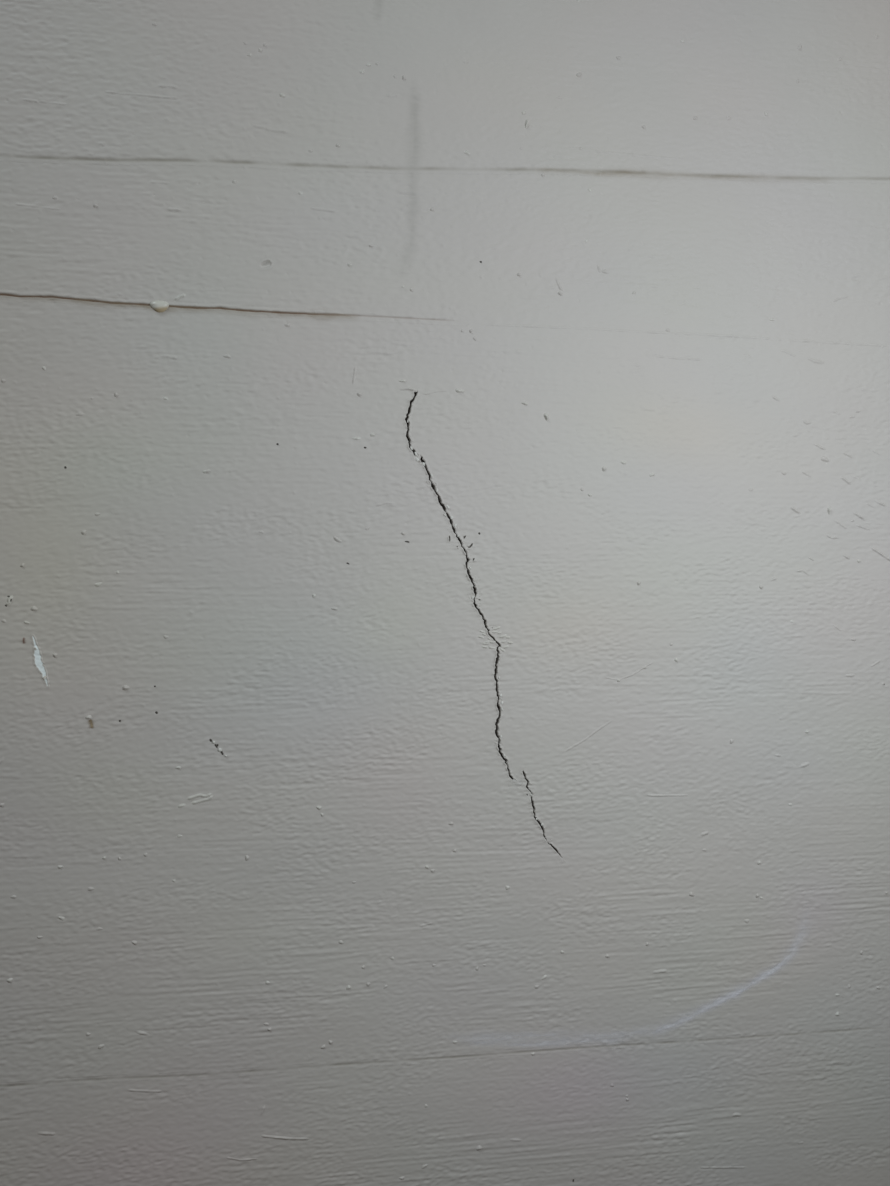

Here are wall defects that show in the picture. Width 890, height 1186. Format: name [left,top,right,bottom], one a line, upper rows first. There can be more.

crack [401,387,568,866]